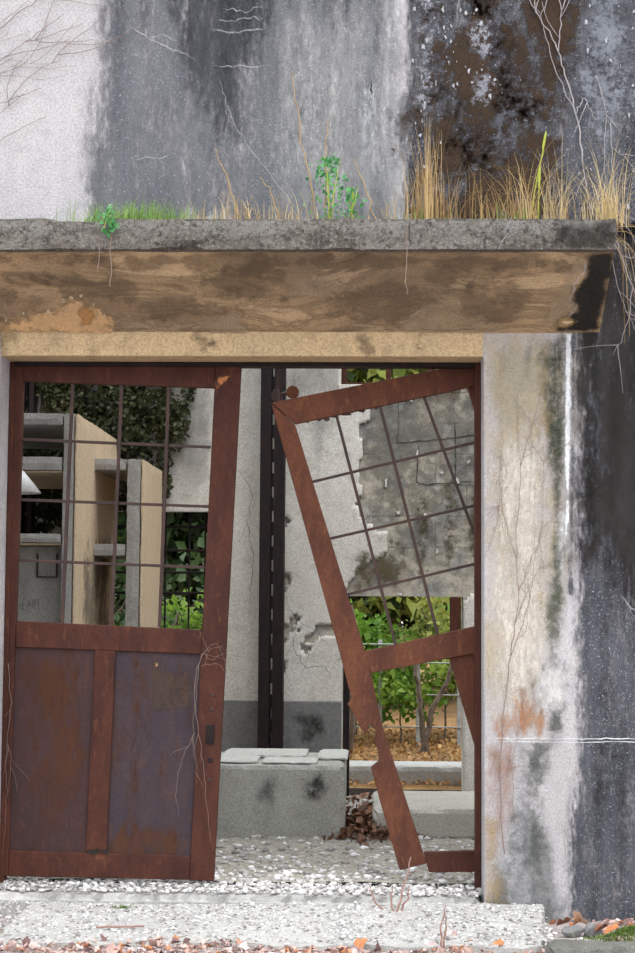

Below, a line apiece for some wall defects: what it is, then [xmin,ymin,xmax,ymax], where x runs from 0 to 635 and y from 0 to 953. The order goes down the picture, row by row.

spalling [4,294,114,333]
water stain [88,0,635,592]
flaking render [396,400,474,485]
water stain [547,495,573,636]
water stain [569,386,635,922]
corrosion [496,701,544,735]
water stain [311,777,324,797]
water stain [528,745,542,785]
water stain [487,814,557,920]